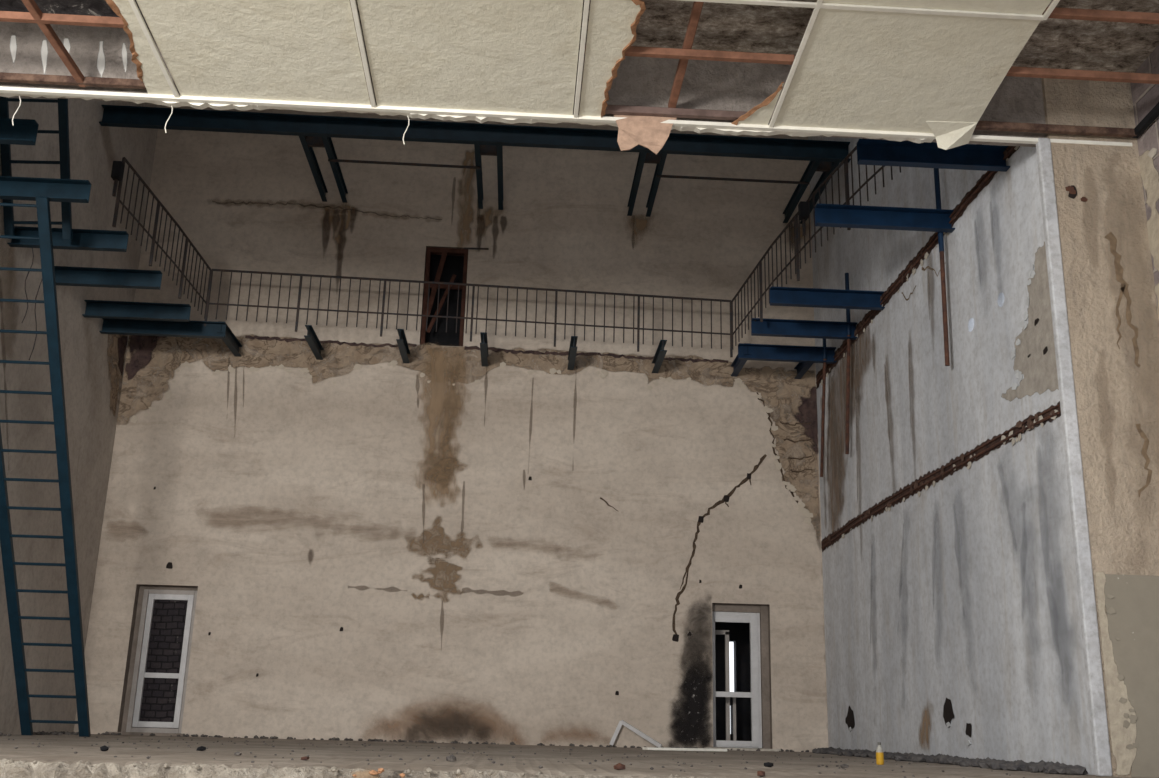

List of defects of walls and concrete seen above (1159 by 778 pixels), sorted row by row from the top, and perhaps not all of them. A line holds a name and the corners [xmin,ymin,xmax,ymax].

flaking render [0,93,618,127]
flaking render [671,126,934,144]
flaking render [1001,242,1059,401]
rust [816,146,1061,552]
flaking render [107,334,820,540]
crack [672,454,767,642]
leakage [380,706,520,743]
spalling [845,706,855,732]
spalling [943,698,972,746]